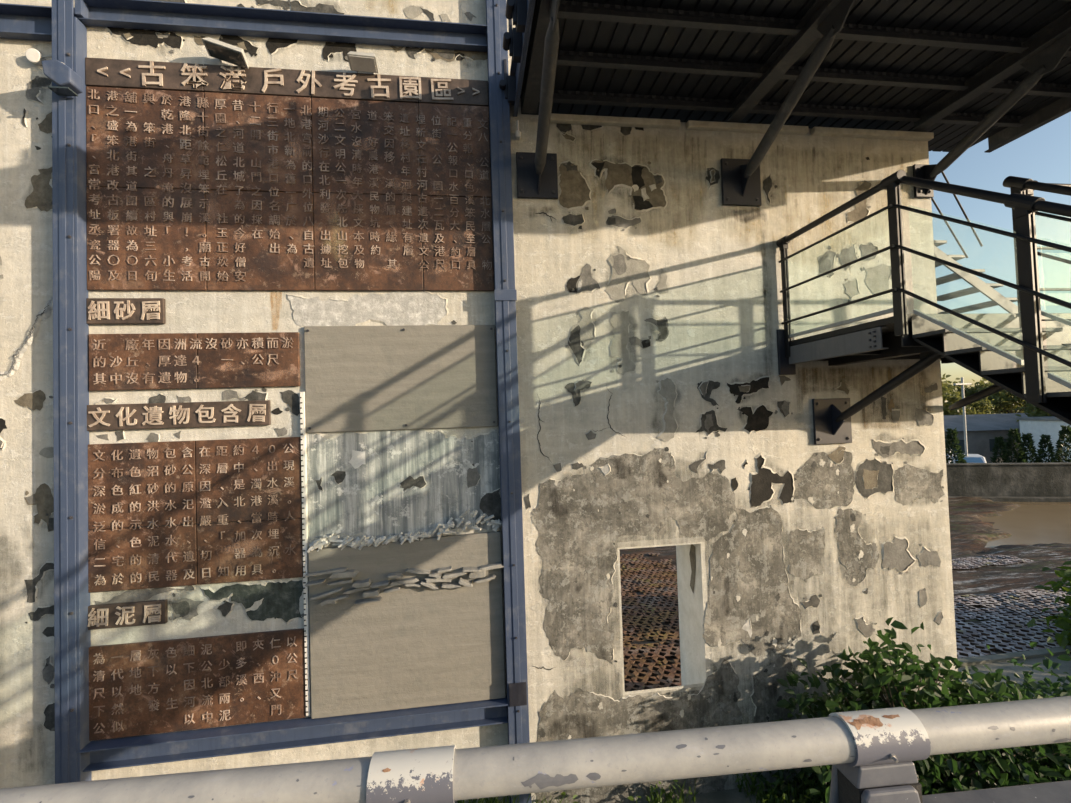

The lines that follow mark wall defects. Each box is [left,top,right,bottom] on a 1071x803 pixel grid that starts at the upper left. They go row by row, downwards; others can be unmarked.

peeling [105,27,205,53]
peeling [219,35,299,57]
peeling [24,167,52,212]
peeling [557,159,668,231]
crack [0,297,53,381]
peeling [565,246,669,375]
peeling [524,375,945,755]
peeling [521,760,729,803]